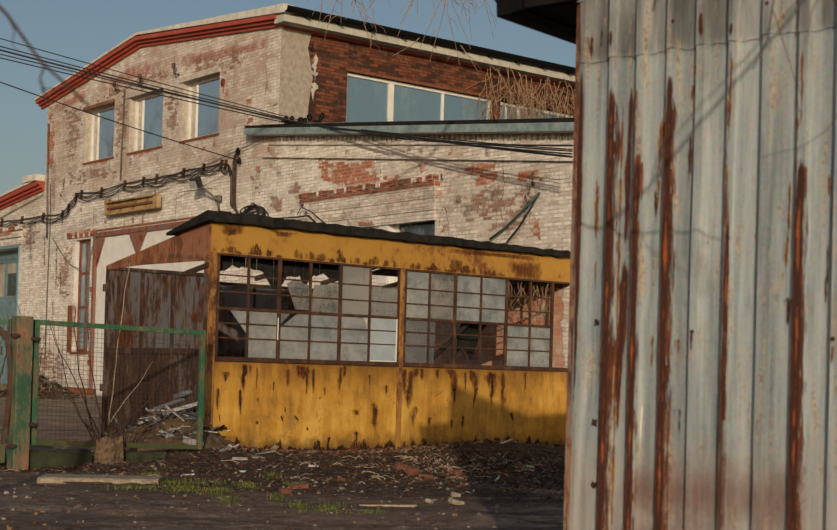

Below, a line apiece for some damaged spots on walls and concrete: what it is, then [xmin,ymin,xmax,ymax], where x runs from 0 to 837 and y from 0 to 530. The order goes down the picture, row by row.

corrosion [796,53,804,138]
flaking render [317,158,399,186]
flaking render [457,161,542,239]
corrosion [295,249,396,267]
corrosion [596,87,643,530]
corrosion [655,77,681,530]
corrosion [784,161,808,530]
corrosion [239,364,258,413]
corrosion [286,366,325,399]
corrosion [403,369,424,423]
corrosion [436,369,506,407]